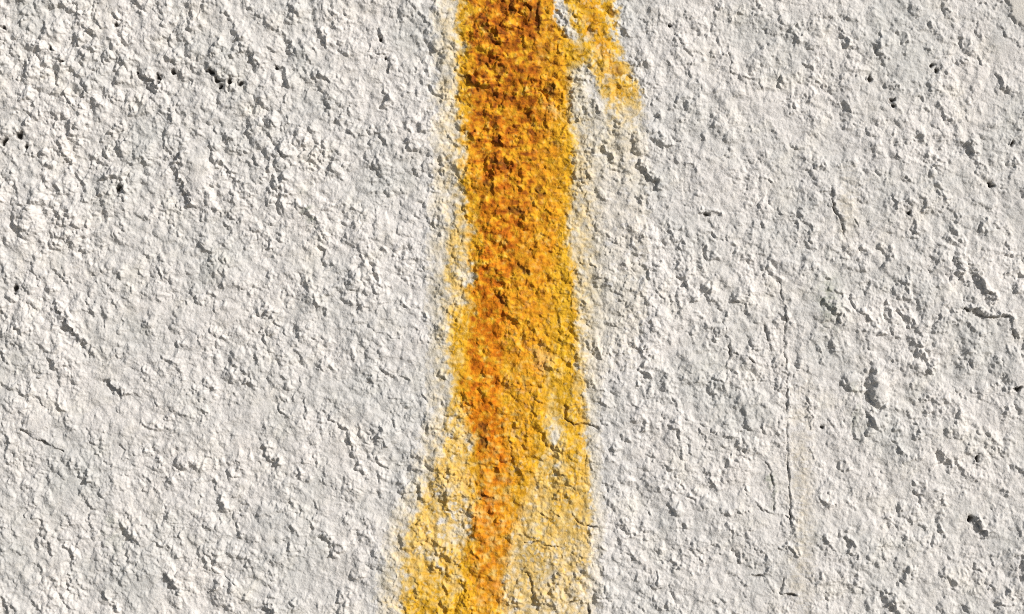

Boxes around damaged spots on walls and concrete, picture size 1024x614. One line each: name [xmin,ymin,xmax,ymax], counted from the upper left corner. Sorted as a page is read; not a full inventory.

rust [369,0,653,614]
crack [722,281,792,534]